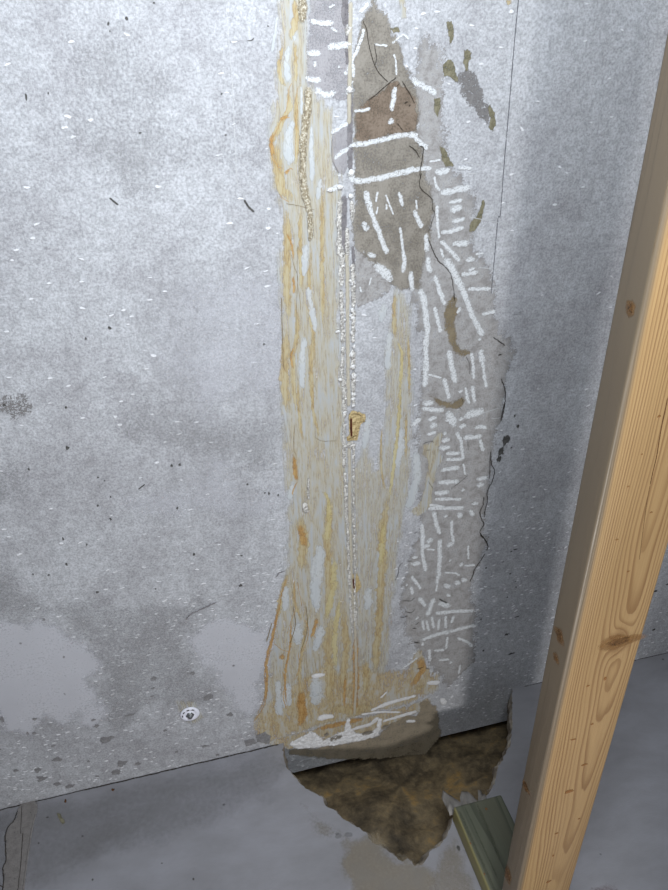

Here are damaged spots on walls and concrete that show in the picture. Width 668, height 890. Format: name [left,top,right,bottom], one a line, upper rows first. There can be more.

crack [363,21,455,301]
rust [254,0,440,749]
spalling [347,411,366,441]
spalling [496,435,512,462]
crack [470,452,495,581]
damp [0,621,106,740]
damp [187,618,274,717]
crack [0,744,278,890]